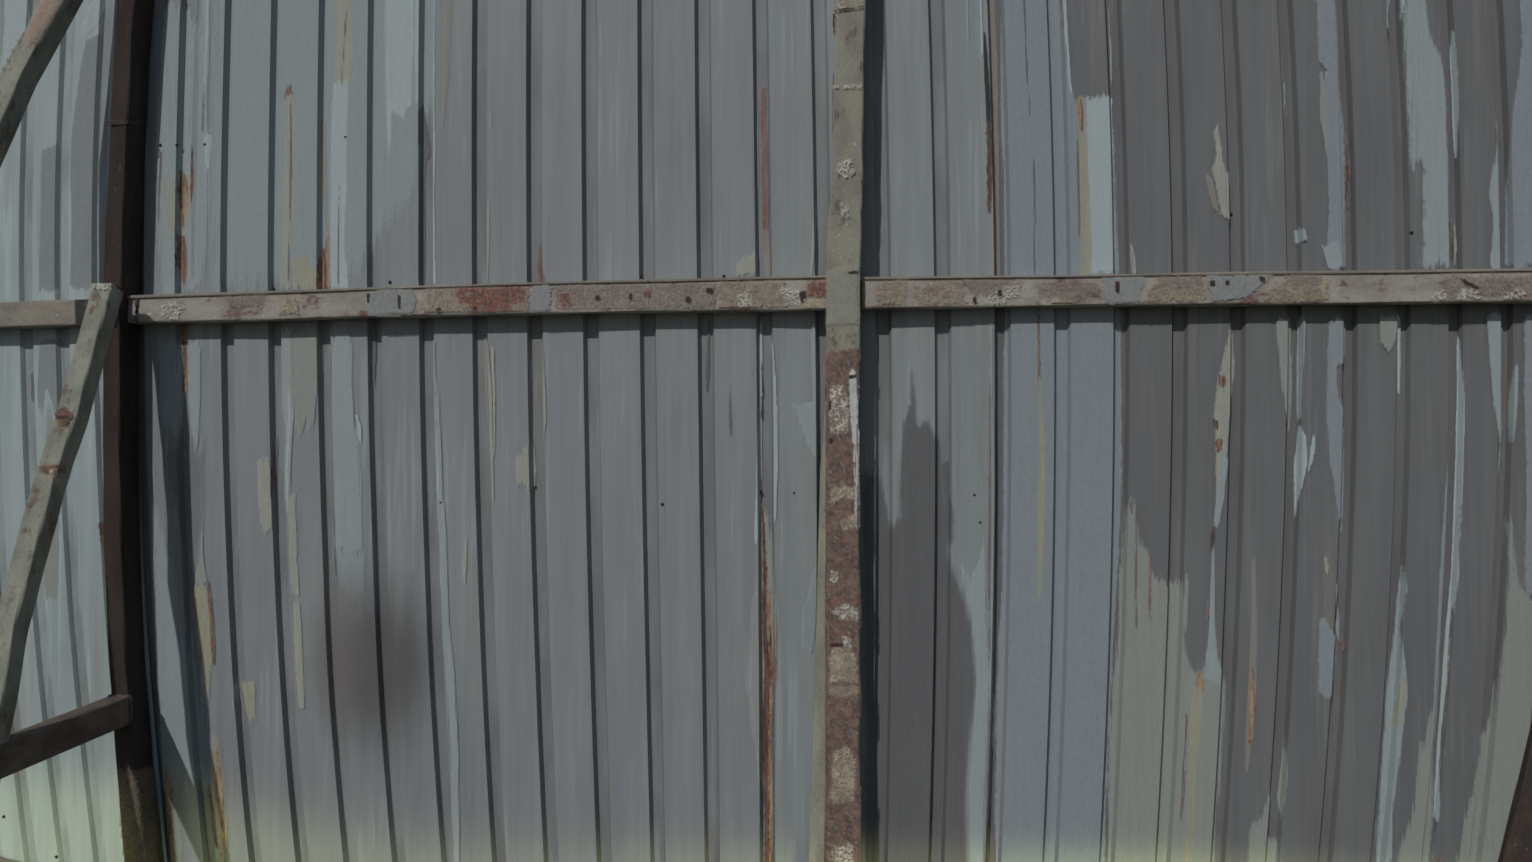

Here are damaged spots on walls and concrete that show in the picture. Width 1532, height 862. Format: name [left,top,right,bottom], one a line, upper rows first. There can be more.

rust [157,100,204,290]
rust [282,83,297,289]
peeling [1294,228,1307,244]
peeling [1317,0,1345,269]
peeling [1277,313,1345,533]
peeling [1376,0,1532,862]
rust [192,580,215,697]
rust [749,322,779,862]
peeling [1318,557,1346,699]
rust [208,746,227,862]
peeling [1249,747,1288,862]